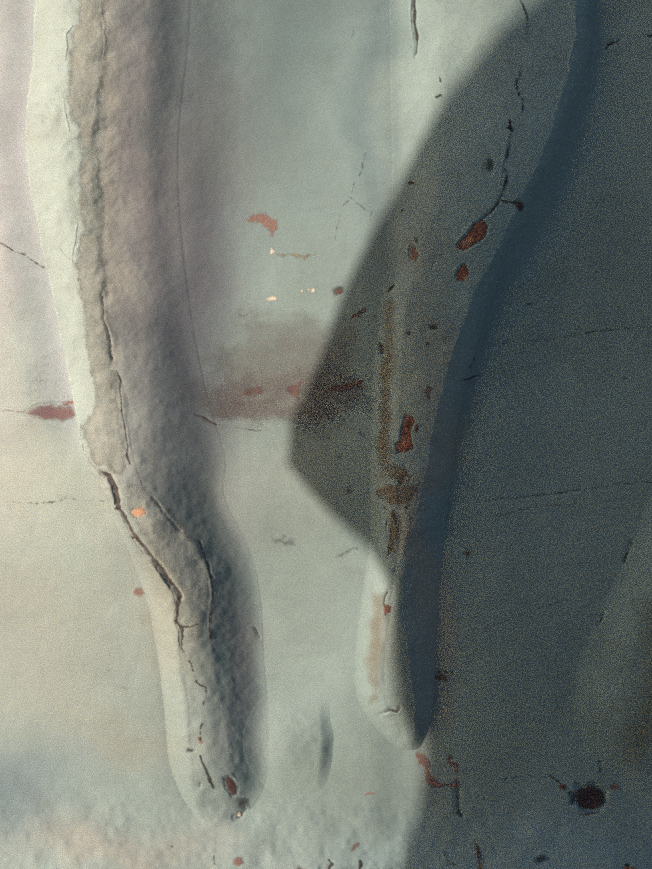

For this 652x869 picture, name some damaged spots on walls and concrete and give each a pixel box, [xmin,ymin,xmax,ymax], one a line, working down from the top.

crack [408,0,419,55]
crack [480,65,524,221]
spalling [249,214,277,236]
spalling [455,221,492,250]
spalling [381,415,419,500]
crack [96,294,215,789]